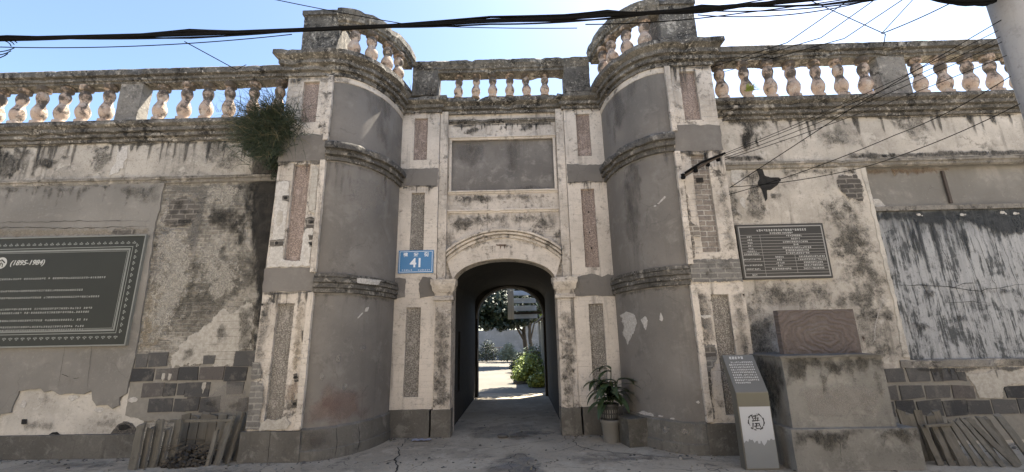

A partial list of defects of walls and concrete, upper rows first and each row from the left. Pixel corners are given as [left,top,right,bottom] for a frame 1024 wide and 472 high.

water stain [0,144,76,197]
water stain [98,140,320,353]
water stain [680,114,1024,218]
flaking render [837,174,886,207]
water stain [876,208,1024,272]
flaking render [0,183,263,436]
peeling [620,312,663,345]
water stain [740,205,891,417]